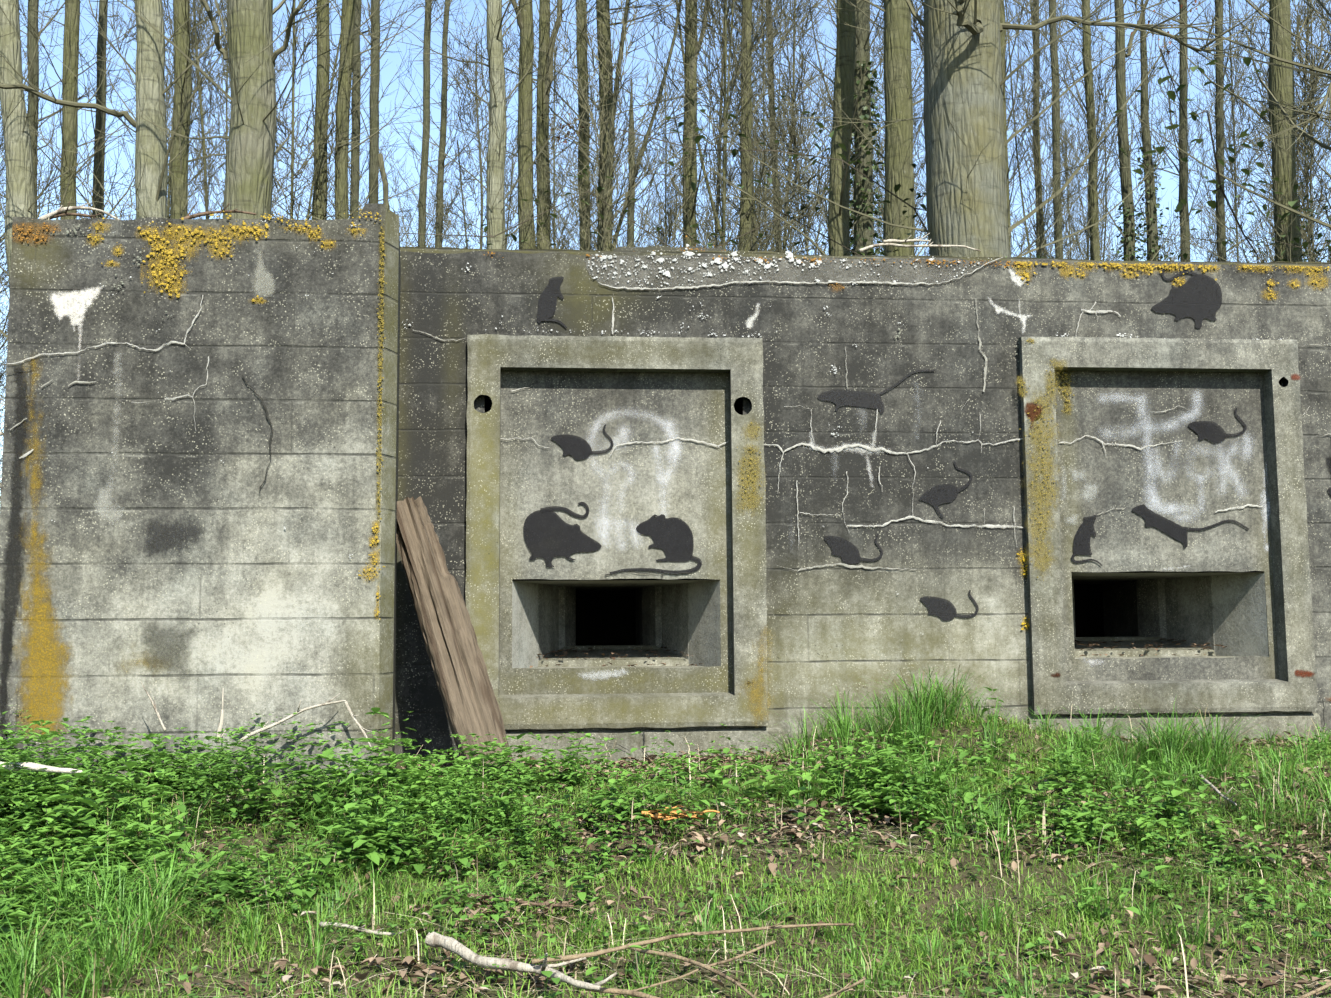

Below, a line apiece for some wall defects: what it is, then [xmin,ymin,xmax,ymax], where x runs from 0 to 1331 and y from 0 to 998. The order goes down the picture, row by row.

water stain [51,287,100,345]
crack [1076,301,1121,333]
crack [9,295,209,430]
crack [10,418,34,459]
crack [242,374,273,493]
crack [610,437,728,456]
crack [764,302,1024,571]
rust [1025,403,1042,428]
crack [1059,405,1191,458]
crack [1215,504,1262,513]
water stain [0,364,28,739]